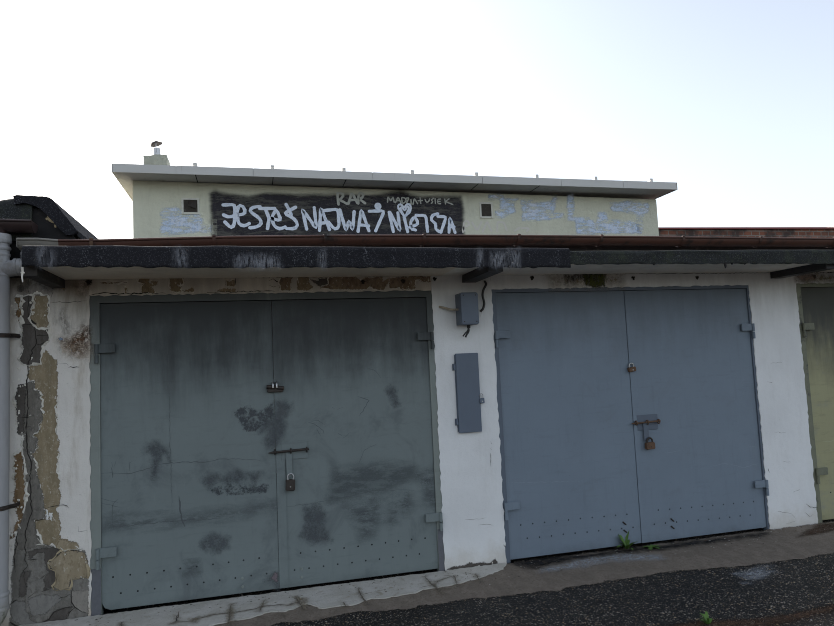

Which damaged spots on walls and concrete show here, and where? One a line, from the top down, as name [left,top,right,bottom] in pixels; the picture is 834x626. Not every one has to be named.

peeling [207,276,431,293]
leakage [62,330,88,352]
crack [10,280,86,626]
flaking render [9,291,91,626]
crack [170,599,304,624]